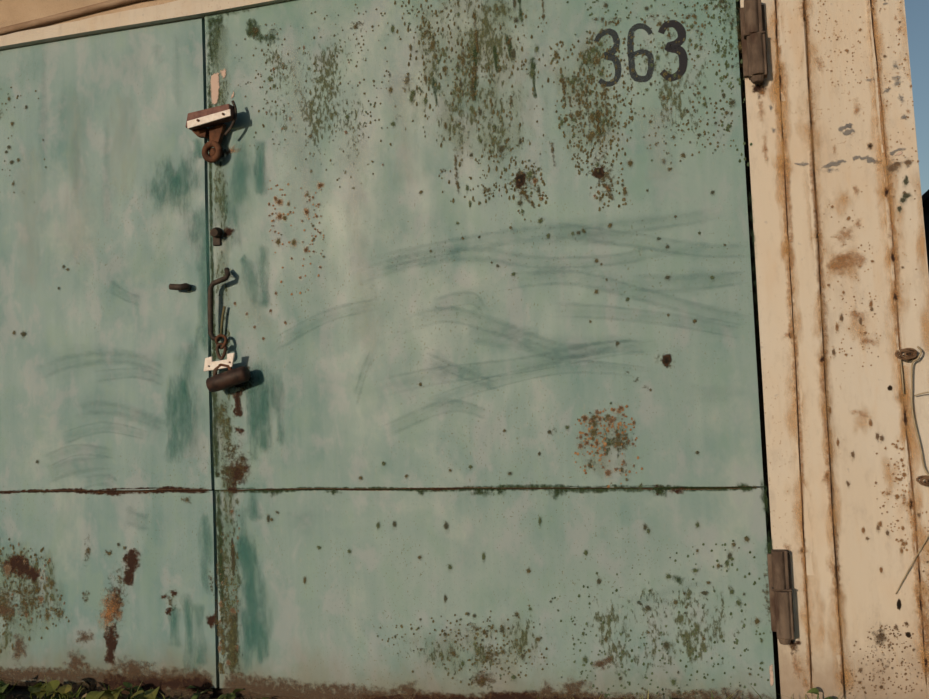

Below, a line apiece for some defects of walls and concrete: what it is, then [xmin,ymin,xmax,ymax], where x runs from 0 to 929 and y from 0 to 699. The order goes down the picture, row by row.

leakage [246,19,264,41]
rust [238,0,734,207]
rust [268,180,324,278]
rust [0,486,208,503]
rust [216,367,757,499]
rust [0,538,212,699]
rust [206,523,770,699]